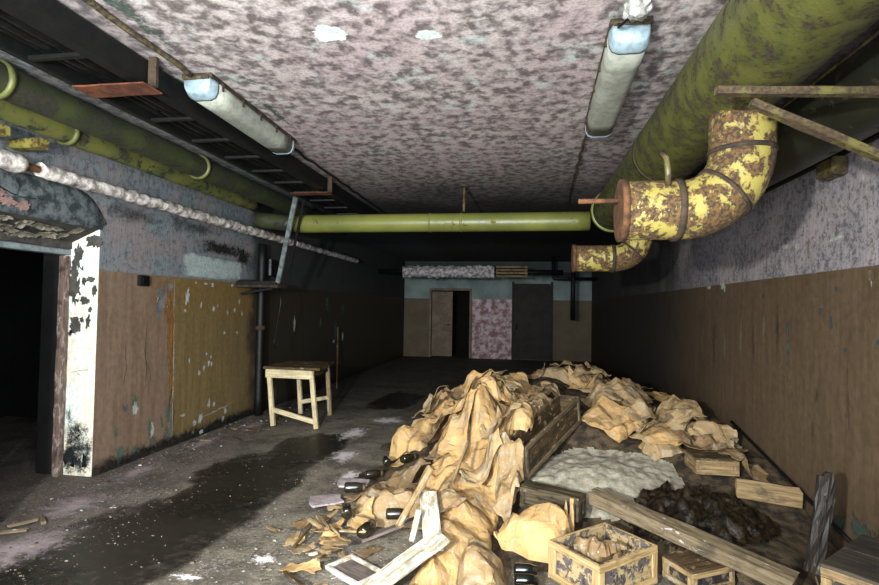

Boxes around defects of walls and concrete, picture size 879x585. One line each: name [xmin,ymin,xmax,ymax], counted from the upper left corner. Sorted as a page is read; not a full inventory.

peeling [312,25,348,42]
peeling [415,30,442,40]
peeling [0,188,102,336]
peeling [155,283,174,319]
water stain [0,392,424,585]